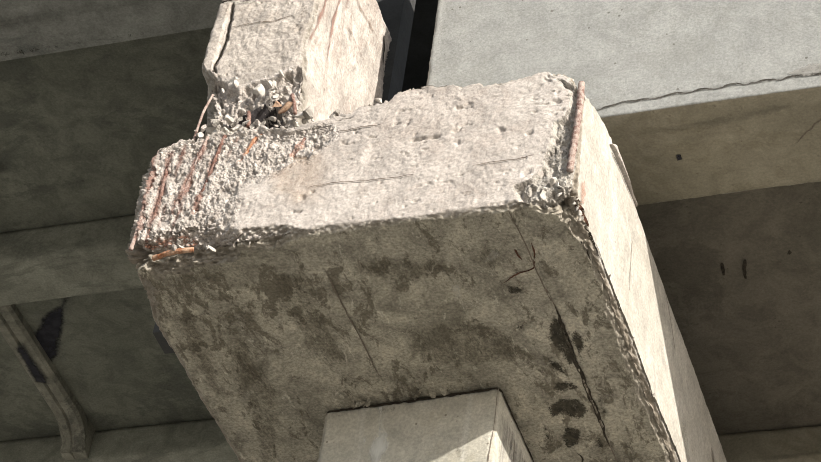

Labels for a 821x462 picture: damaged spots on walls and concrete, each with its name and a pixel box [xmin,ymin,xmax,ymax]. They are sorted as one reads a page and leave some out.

crack [213,0,292,73]
crack [598,73,821,110]
spalling [129,64,341,261]
spalling [512,78,585,209]
leakage [16,347,47,383]
leakage [35,299,66,361]
crack [326,272,379,375]
crack [502,208,618,462]
leakage [549,318,588,418]
crack [572,197,681,462]
leakage [562,428,580,447]